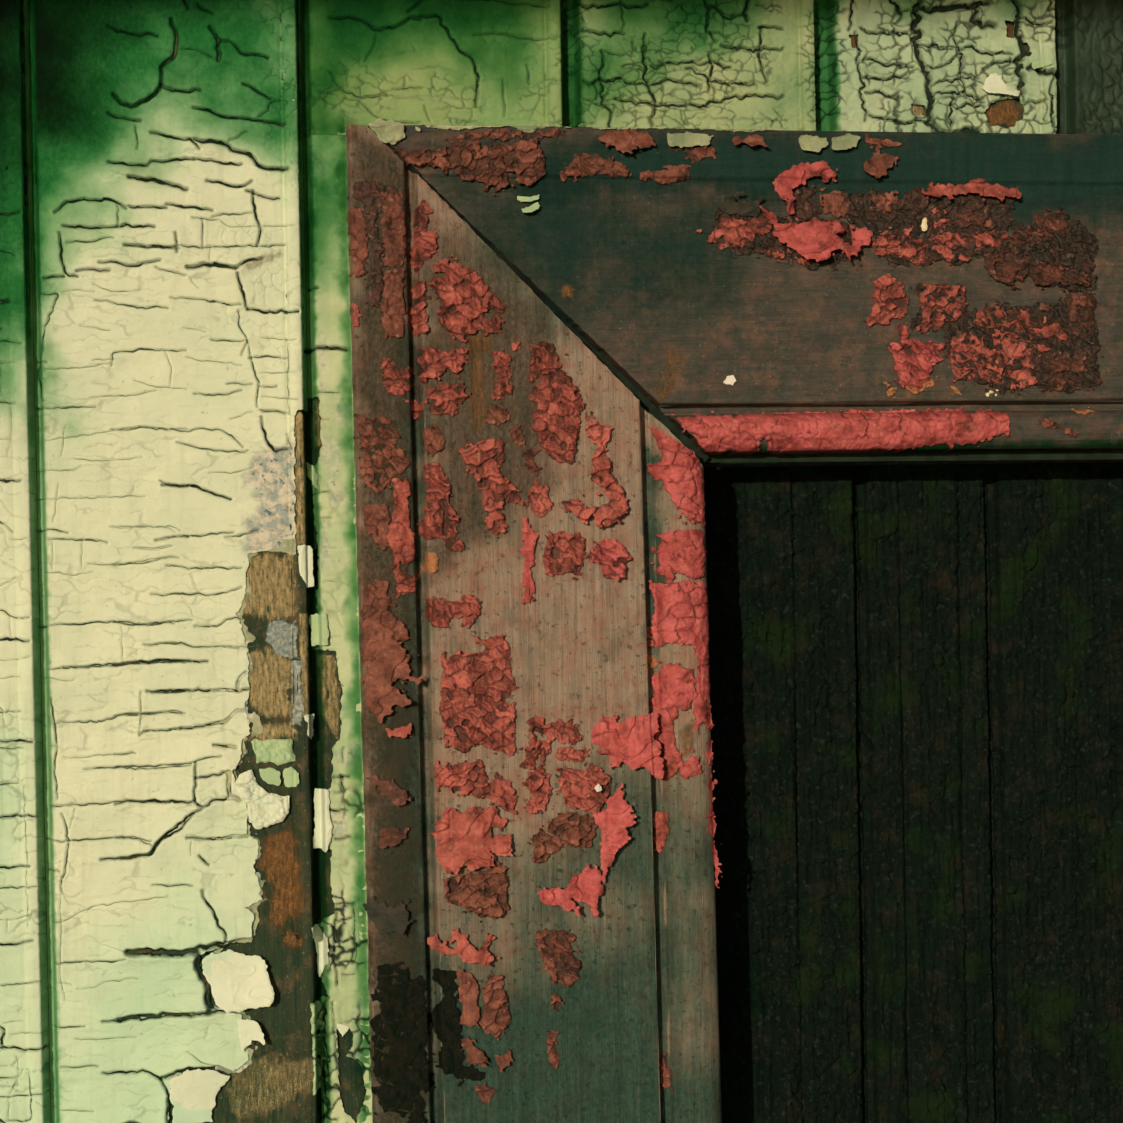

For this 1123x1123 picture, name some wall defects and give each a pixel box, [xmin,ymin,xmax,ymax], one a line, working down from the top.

crack [335,17,549,124]
crack [582,0,782,126]
crack [848,0,1055,133]
peeling [981,73,1020,126]
peeling [368,118,784,213]
crack [0,74,342,1123]
peeling [235,400,340,829]
peeling [347,133,1104,1123]
peeling [313,788,333,852]
peeling [202,949,274,1052]
peeling [312,924,329,977]
peeling [310,1000,349,1096]